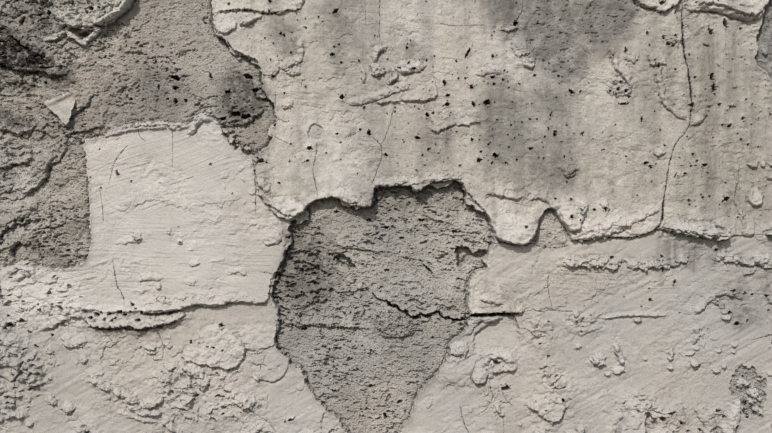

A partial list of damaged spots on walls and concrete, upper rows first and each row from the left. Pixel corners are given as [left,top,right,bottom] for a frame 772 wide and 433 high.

spalling [0,0,772,272]
crack [492,0,693,249]
spalling [259,178,496,433]
crack [373,272,572,337]
spalling [474,314,520,364]
spalling [729,365,767,417]